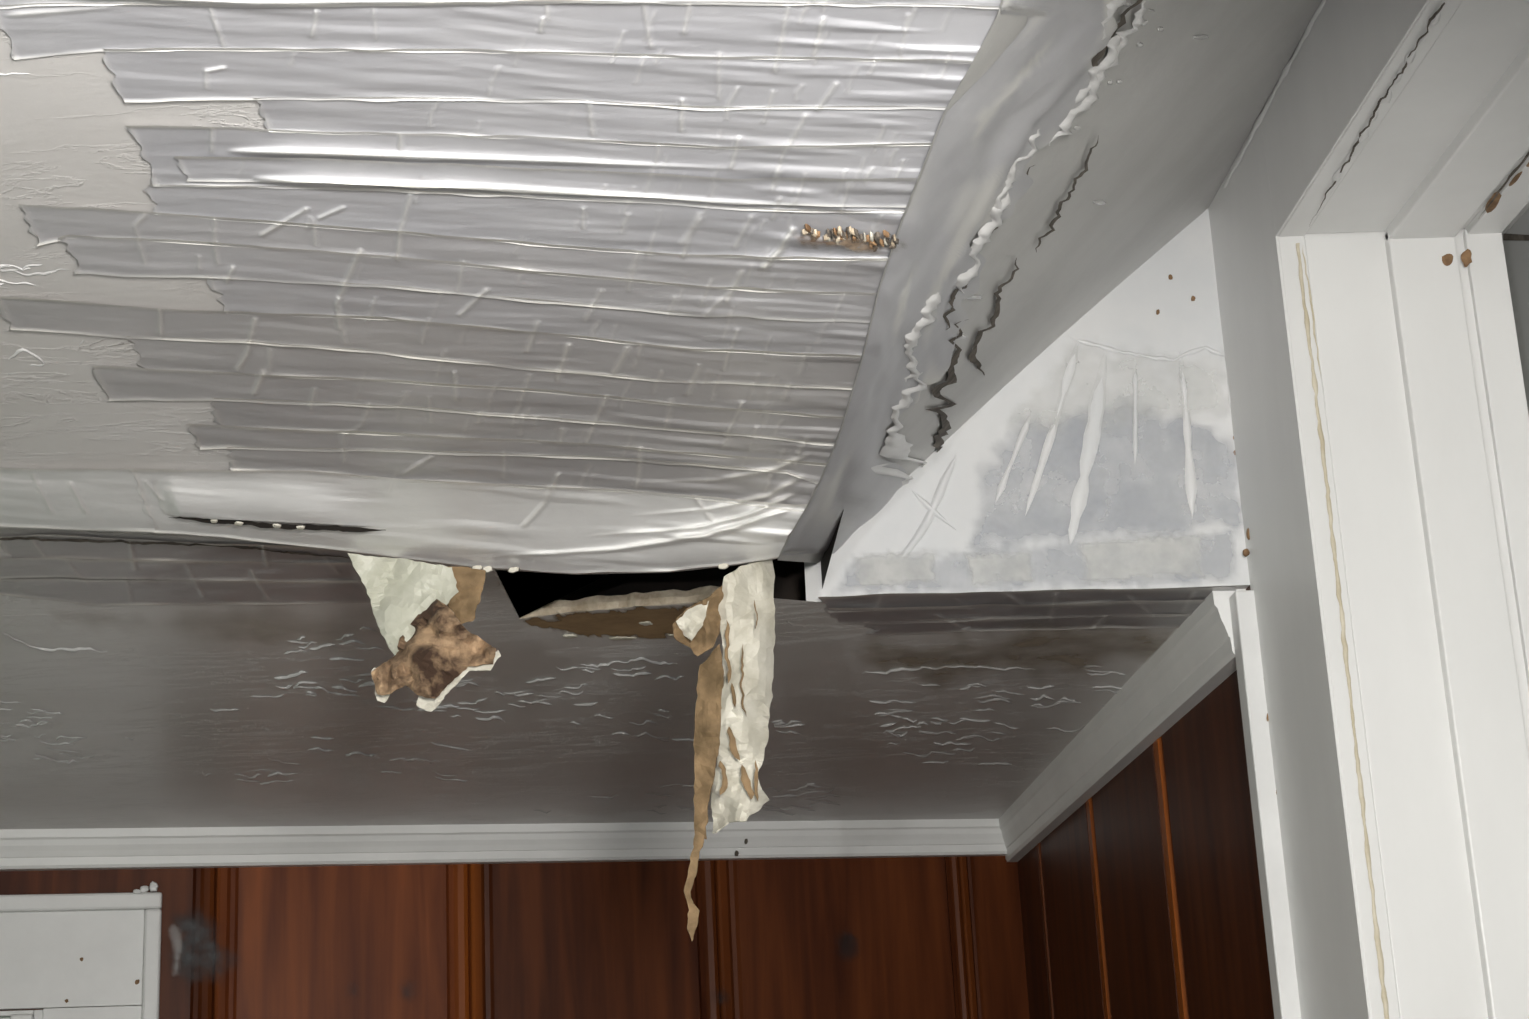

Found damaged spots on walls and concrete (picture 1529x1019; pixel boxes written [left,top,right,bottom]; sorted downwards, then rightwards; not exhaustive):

crack [1480,152,1529,241]
water stain [797,235,876,251]
peeling [5,634,107,653]
peeling [235,512,843,941]
peeling [863,665,1080,765]
peeling [1085,665,1125,706]